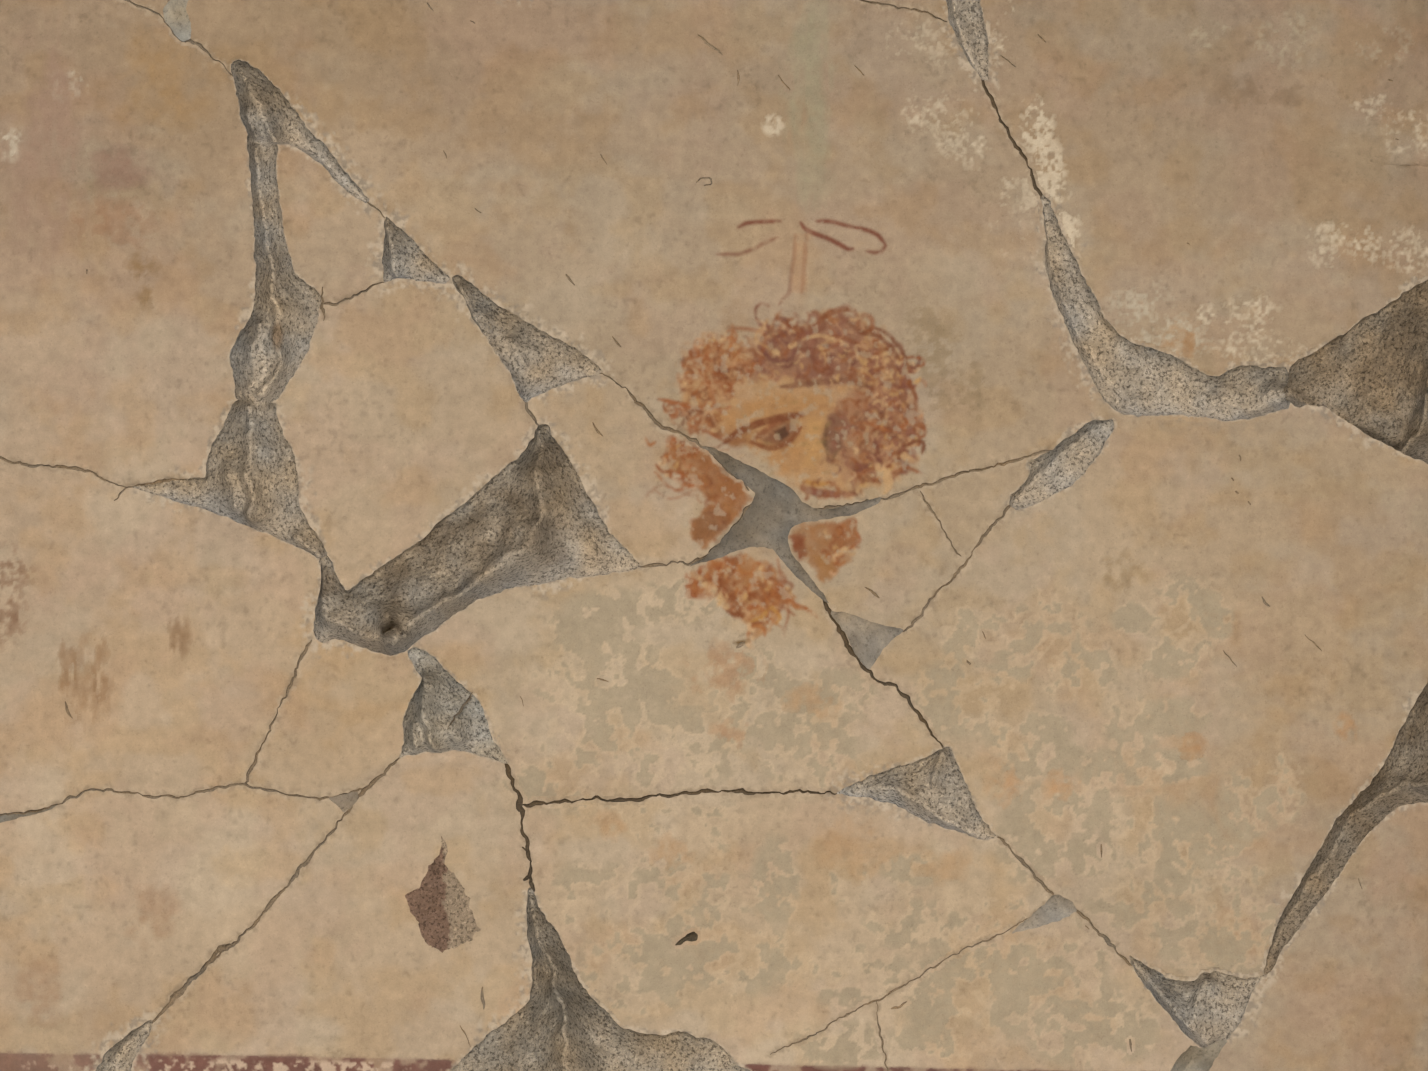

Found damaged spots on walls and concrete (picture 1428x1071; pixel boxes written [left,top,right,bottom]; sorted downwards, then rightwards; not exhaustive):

crack [981,79,1043,199]
spalling [133,59,641,764]
spalling [1009,195,1428,510]
crack [819,450,1051,632]
crack [823,600,944,748]
crack [0,639,400,1024]
spalling [405,836,481,953]
spalling [450,887,750,1071]
crack [505,764,837,892]
spalling [837,747,997,840]
crack [770,836,1132,1071]
spalling [1130,683,1428,1048]